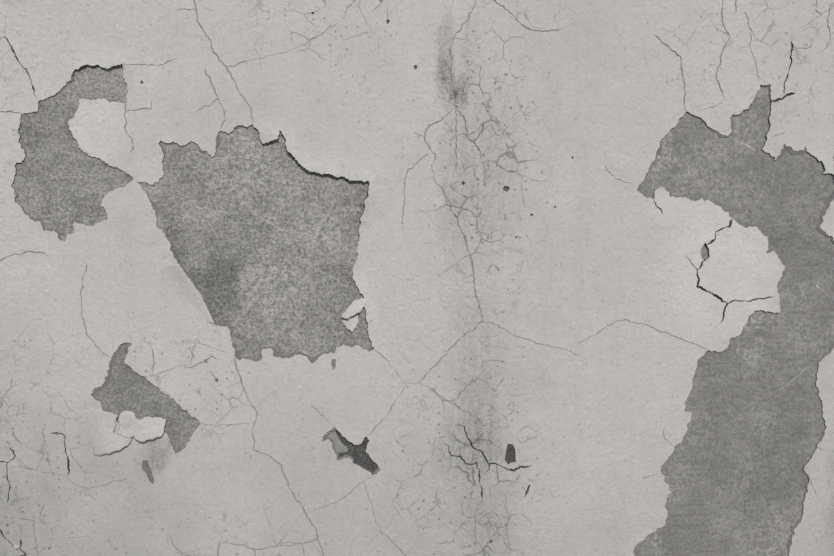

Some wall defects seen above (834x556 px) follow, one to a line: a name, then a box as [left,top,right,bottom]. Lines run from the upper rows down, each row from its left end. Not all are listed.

crack [179,0,388,129]
crack [707,0,759,108]
crack [771,0,831,102]
peeling [11,64,374,369]
crack [367,0,707,556]
crack [685,219,774,323]
peeling [633,84,834,556]
crack [0,432,128,503]
peeling [87,343,200,456]
crack [182,348,406,556]
peeling [322,427,380,475]
peeling [505,444,516,465]